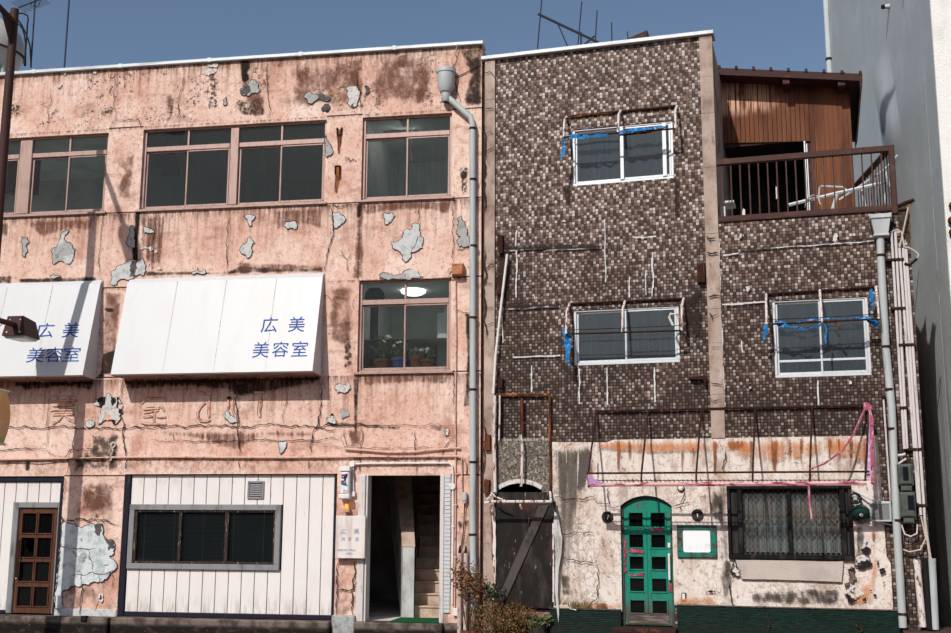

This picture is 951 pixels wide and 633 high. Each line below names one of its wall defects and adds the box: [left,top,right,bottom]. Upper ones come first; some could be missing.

water stain [237,61,264,116]
water stain [295,60,362,105]
peeling [346,85,370,108]
water stain [375,55,430,106]
water stain [464,47,482,104]
spalling [379,223,424,281]
spalling [85,393,123,429]
rust [598,439,866,471]
crack [0,371,455,604]
peeling [53,521,118,610]
crack [335,561,357,615]
peeling [819,539,886,603]